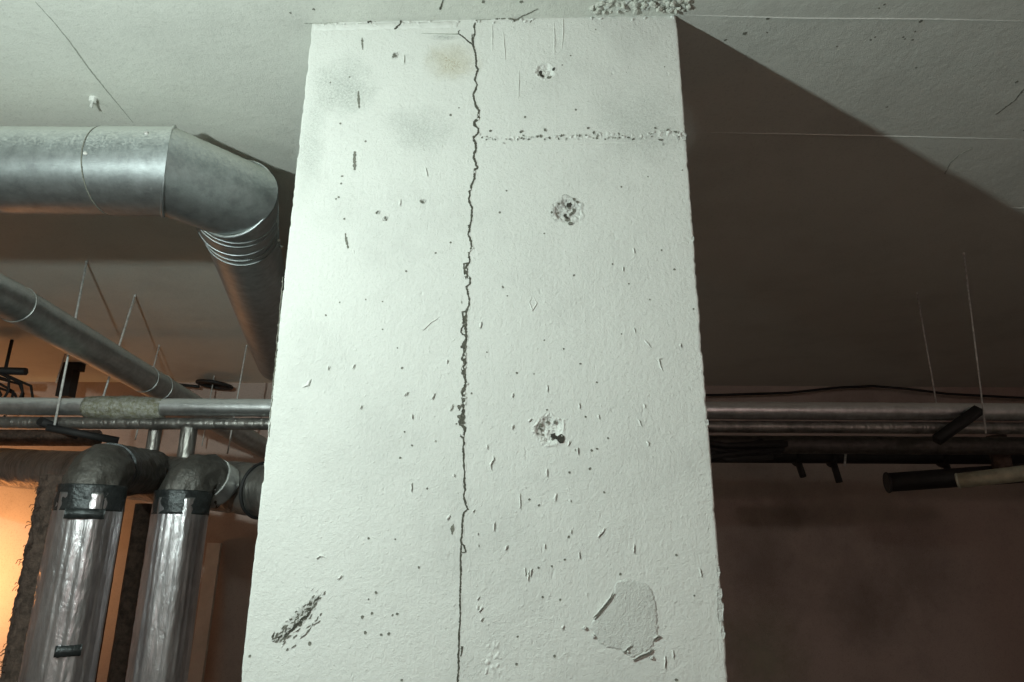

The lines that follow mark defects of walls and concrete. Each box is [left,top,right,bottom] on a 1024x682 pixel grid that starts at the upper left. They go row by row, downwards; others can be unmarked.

spalling [534,62,557,81]
spalling [551,194,585,226]
crack [304,18,534,682]
spalling [531,413,566,448]
spalling [271,588,326,651]